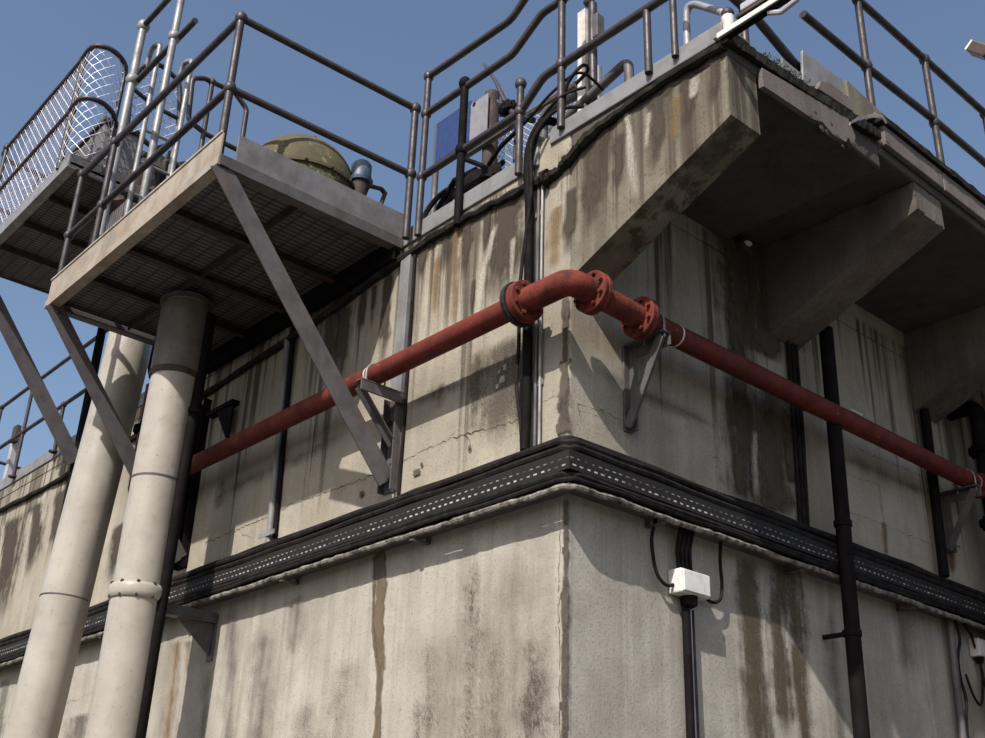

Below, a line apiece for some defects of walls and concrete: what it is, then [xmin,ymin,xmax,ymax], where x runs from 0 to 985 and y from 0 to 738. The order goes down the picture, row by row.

water stain [645,70,698,160]
water stain [710,57,720,98]
water stain [562,114,635,244]
water stain [326,274,392,373]
water stain [470,337,523,431]
crack [405,419,518,460]
water stain [745,391,796,513]
water stain [0,490,65,604]
water stain [110,524,123,573]
water stain [521,644,548,738]
water stain [758,562,810,738]